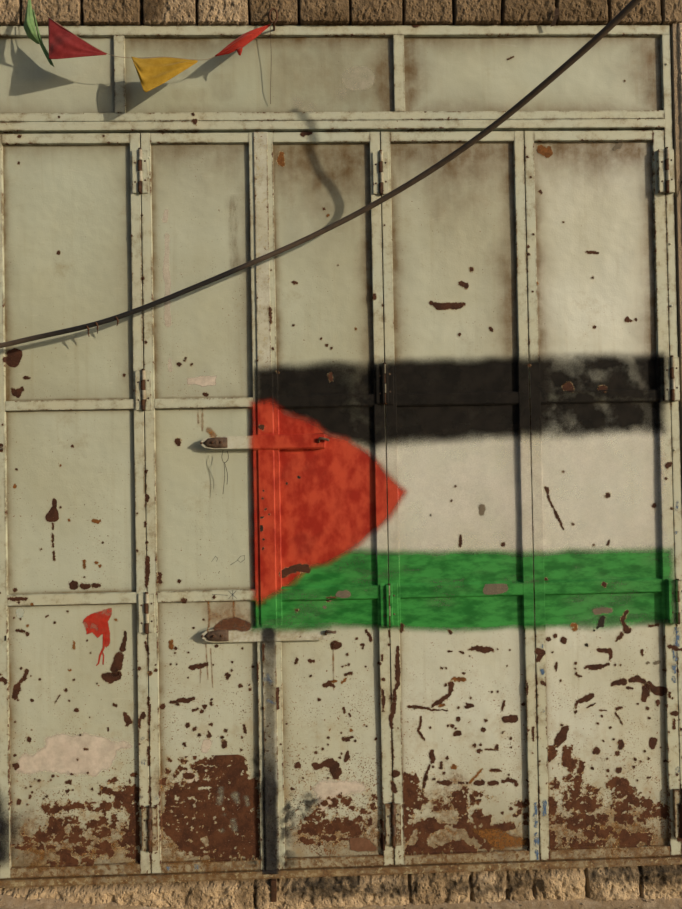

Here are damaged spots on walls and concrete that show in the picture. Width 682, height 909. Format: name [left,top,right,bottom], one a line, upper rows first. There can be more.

peeling [113,696,214,728]
peeling [10,723,261,867]
rust [332,826,381,852]